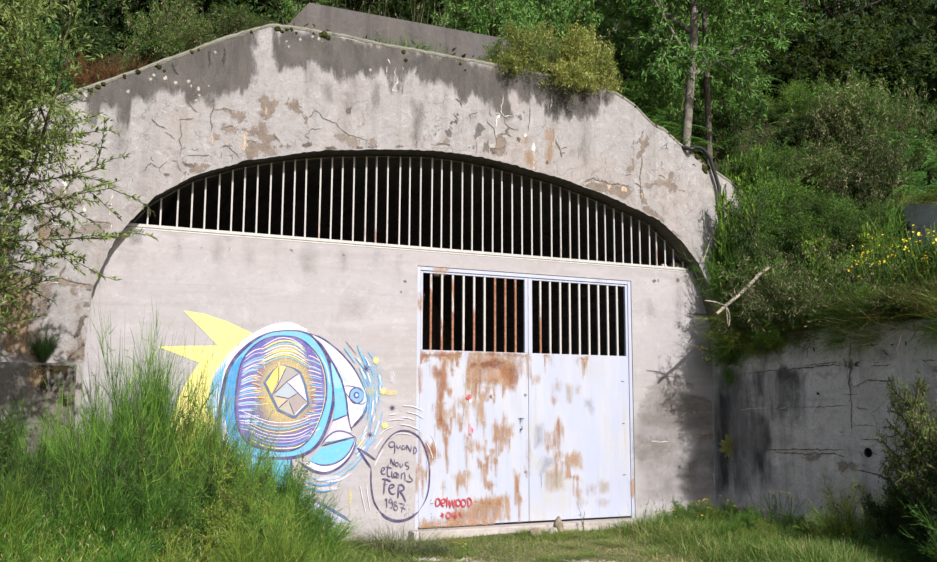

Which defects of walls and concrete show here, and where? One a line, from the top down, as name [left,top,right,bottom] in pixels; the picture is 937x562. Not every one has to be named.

leakage [61,32,257,125]
leakage [273,29,613,126]
crack [143,97,239,171]
spalling [211,94,308,159]
corrosion [415,351,538,528]
corrosion [547,419,579,479]
leakage [693,373,770,488]
leakage [777,367,799,411]
crack [741,328,937,481]